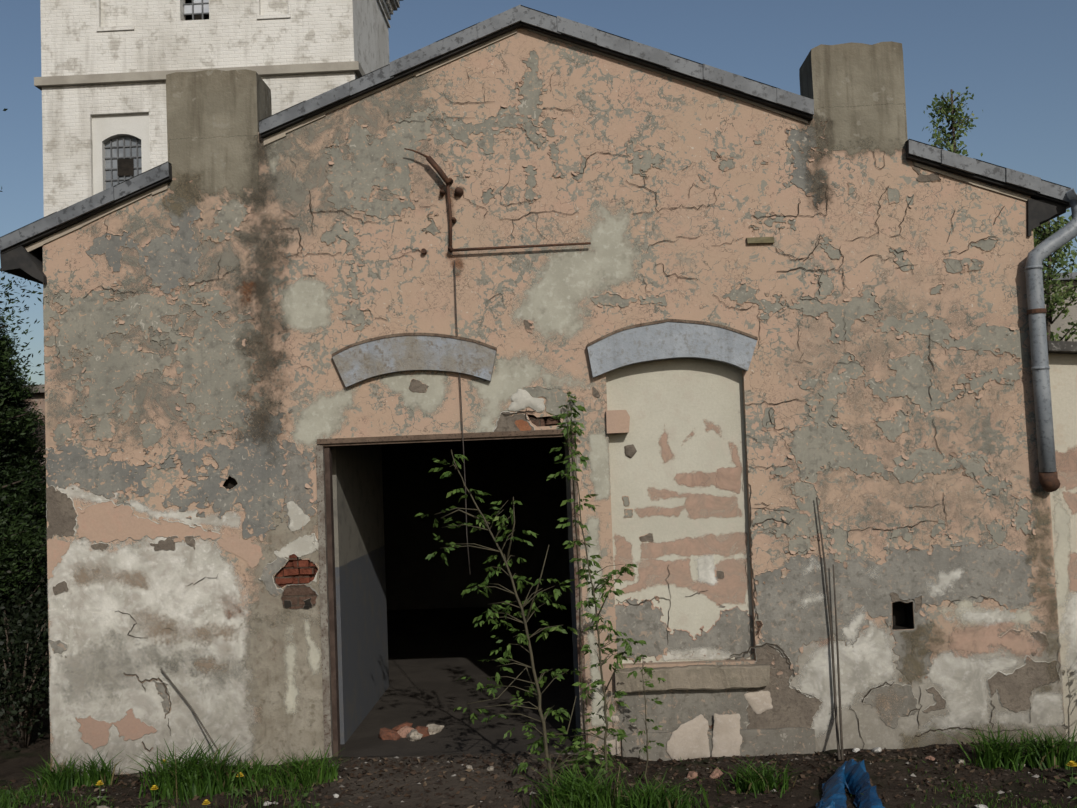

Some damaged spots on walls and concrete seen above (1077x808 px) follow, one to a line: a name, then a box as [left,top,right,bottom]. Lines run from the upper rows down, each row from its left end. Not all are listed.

leakage [48,74,429,442]
crack [279,161,381,276]
peeling [279,50,590,333]
crack [463,167,576,243]
flaking render [512,203,668,341]
peeling [43,135,355,776]
flaking render [382,371,447,414]
flaking render [471,355,633,518]
peeling [585,233,1077,752]
crack [730,399,1031,748]
crack [928,334,944,456]
crack [123,673,171,752]